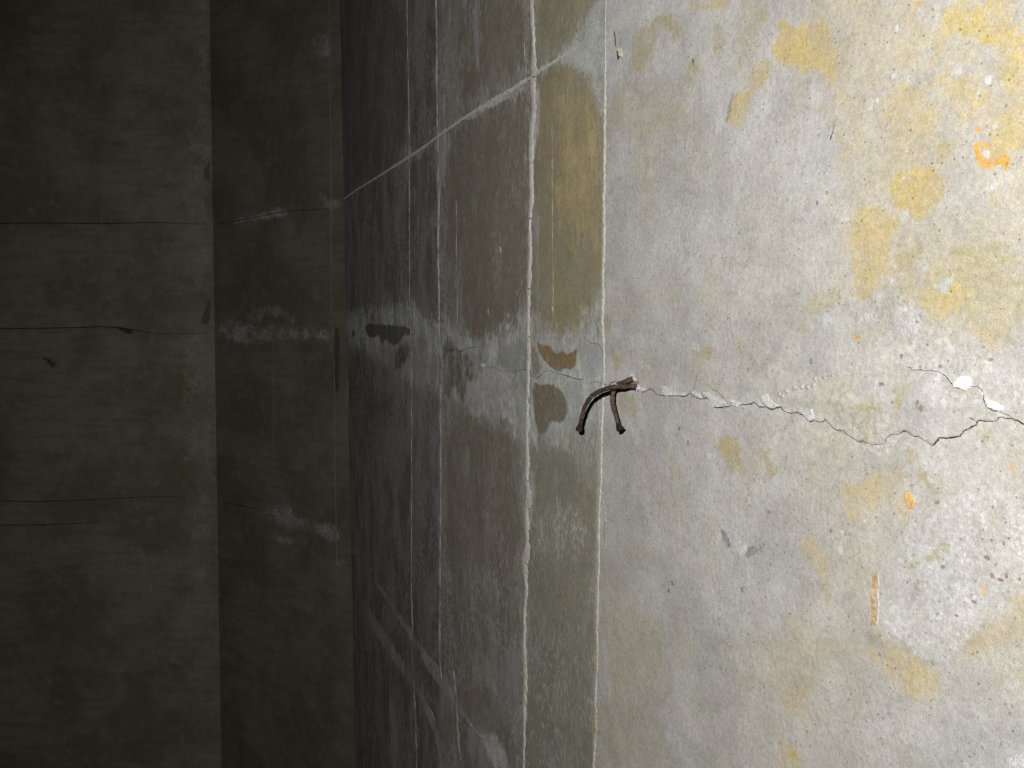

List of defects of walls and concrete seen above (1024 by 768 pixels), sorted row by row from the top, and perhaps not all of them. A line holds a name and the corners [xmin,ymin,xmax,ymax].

damp [726,13,838,126]
damp [943,0,1024,90]
corrosion [974,126,1020,169]
damp [851,75,1024,347]
damp [291,0,680,768]
crack [443,346,1024,446]